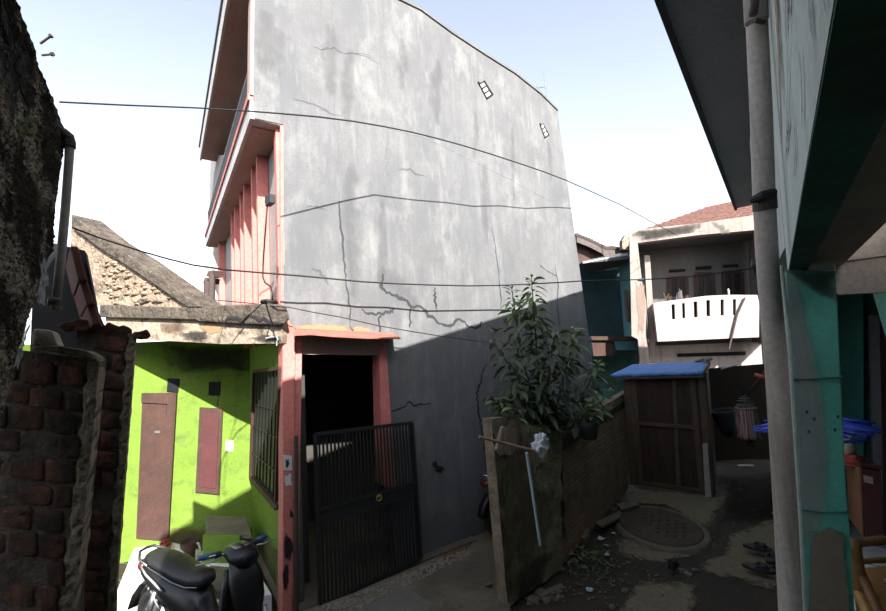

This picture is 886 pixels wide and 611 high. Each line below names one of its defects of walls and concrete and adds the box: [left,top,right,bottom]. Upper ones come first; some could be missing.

damp [774,0,789,152]
crack [339,203,514,332]
crack [391,401,430,412]
crack [475,364,487,469]